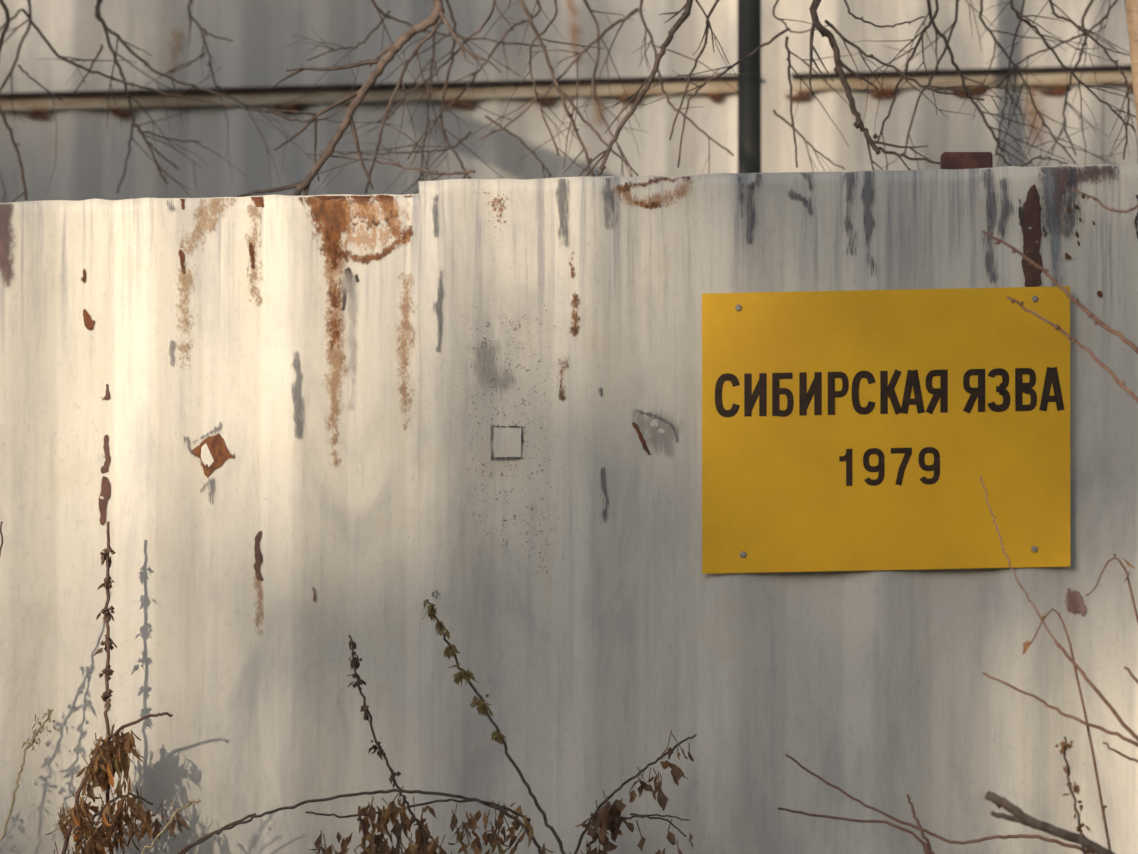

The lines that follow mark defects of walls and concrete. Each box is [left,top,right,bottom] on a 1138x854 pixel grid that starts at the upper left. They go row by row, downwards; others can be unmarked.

corrosion [613,176,692,209]
corrosion [178,198,234,359]
corrosion [299,195,413,465]